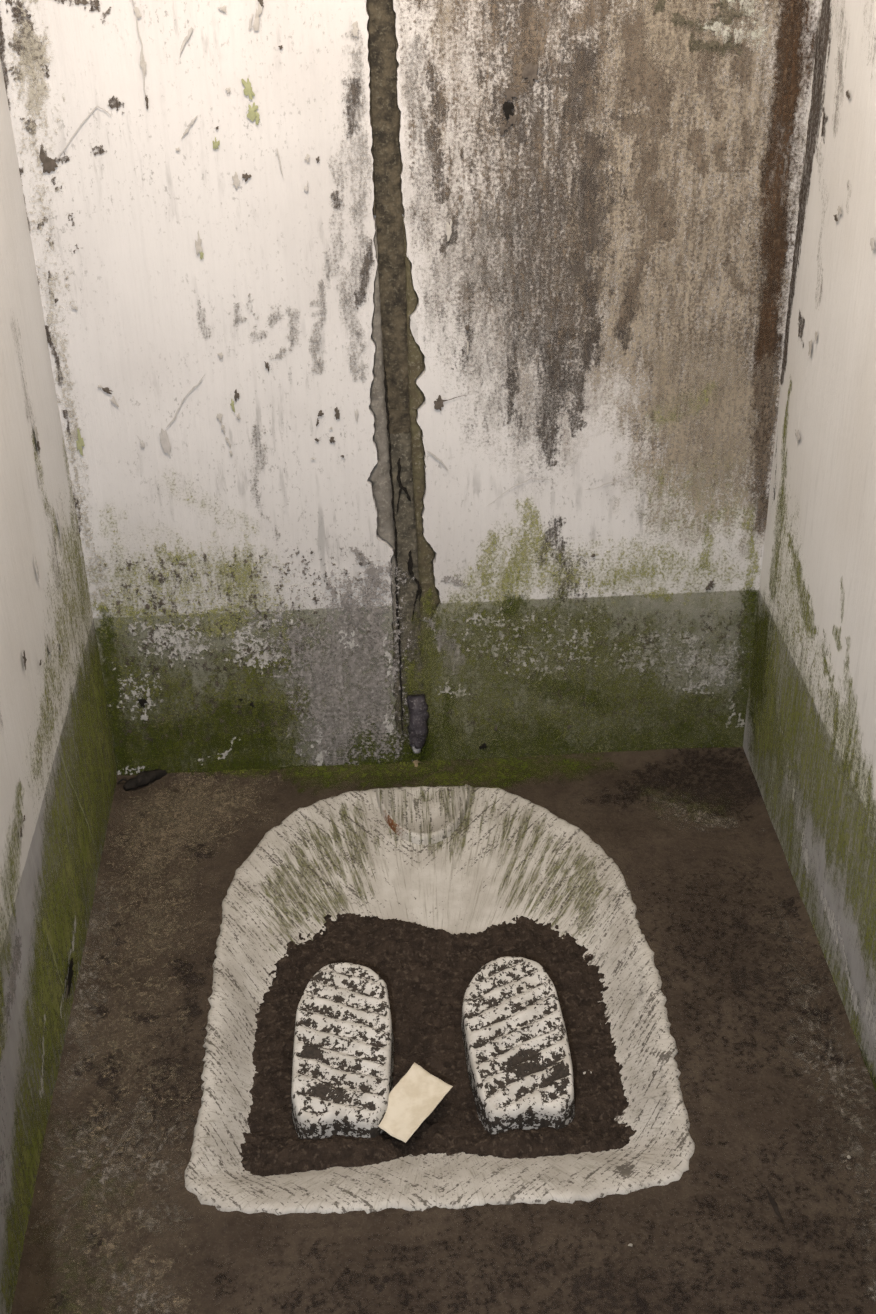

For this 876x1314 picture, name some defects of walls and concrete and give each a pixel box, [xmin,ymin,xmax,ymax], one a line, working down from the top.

peeling [5,0,70,251]
flaking render [703,0,767,47]
peeling [38,0,752,766]
crack [434,395,465,411]
leakage [401,0,808,602]
corrosion [750,0,820,534]
crack [384,359,448,733]
leakage [0,782,23,1023]
leakage [586,748,762,823]
leakage [639,867,876,1097]
leakage [822,581,876,830]
leakage [259,1122,876,1314]